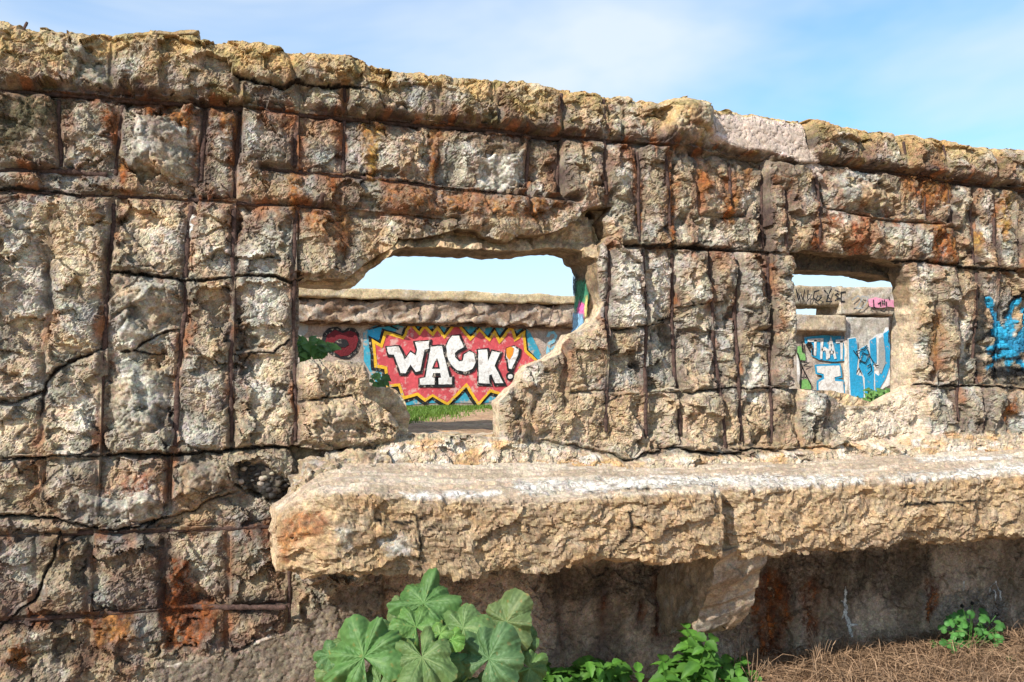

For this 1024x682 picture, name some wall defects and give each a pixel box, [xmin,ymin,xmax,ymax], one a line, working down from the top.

corrosion [166,106,193,135]
corrosion [287,173,350,252]
corrosion [362,123,382,178]
corrosion [385,130,556,220]
corrosion [698,170,713,191]
corrosion [900,175,958,262]
flaking render [635,119,1024,449]
crack [19,329,173,416]
spalling [237,461,291,500]
crack [0,437,300,628]
corrosion [85,613,133,644]
corrosion [161,558,216,647]